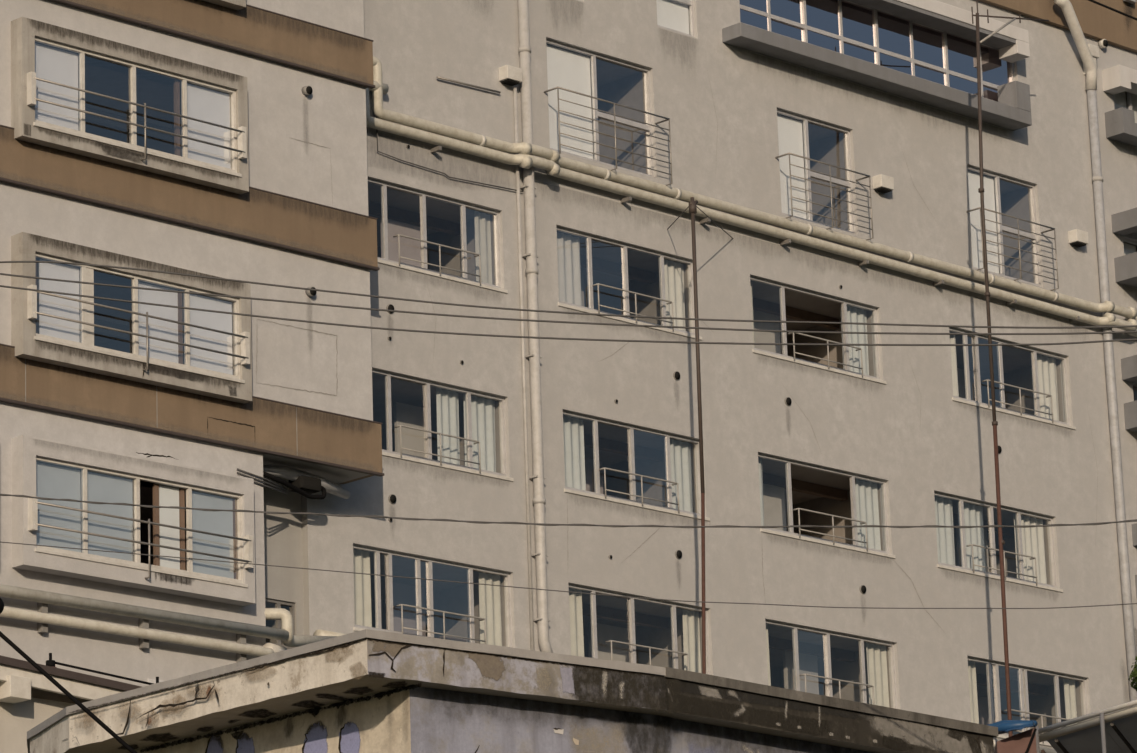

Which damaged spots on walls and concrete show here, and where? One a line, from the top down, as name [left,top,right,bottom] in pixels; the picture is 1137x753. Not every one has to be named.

crack [242,643,445,675]
peeling [469,652,518,681]
crack [117,681,219,735]
spalling [118,671,421,753]
damp [71,638,868,753]
damp [883,735,913,751]